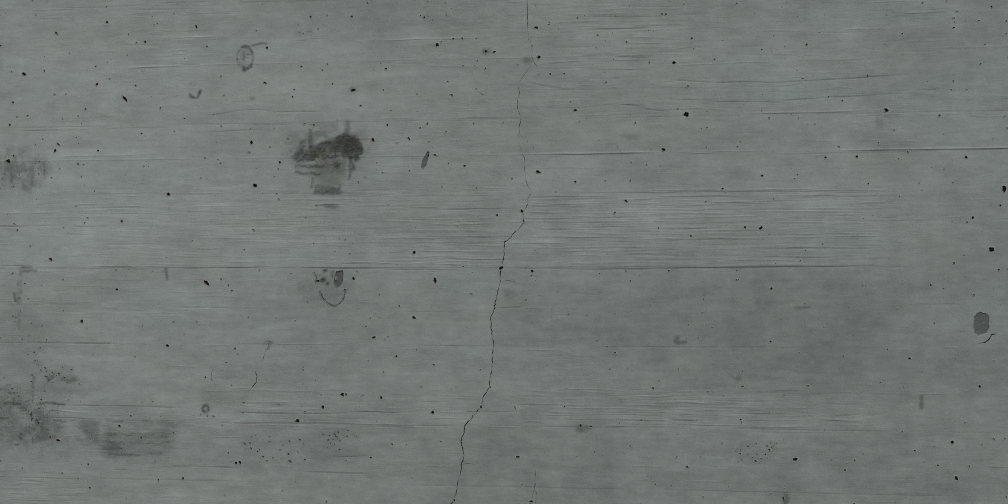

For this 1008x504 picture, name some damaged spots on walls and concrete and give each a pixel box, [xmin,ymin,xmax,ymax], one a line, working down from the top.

leakage [295,134,363,166]
crack [451,7,537,504]